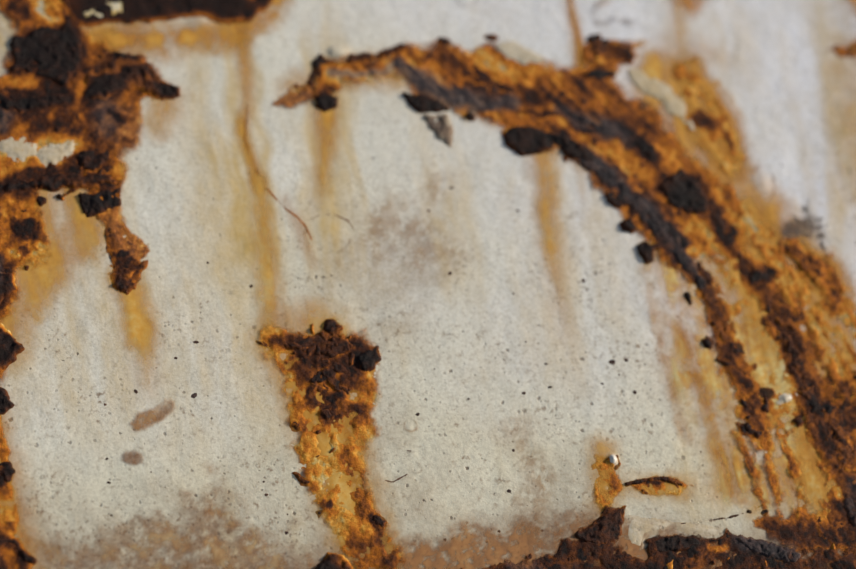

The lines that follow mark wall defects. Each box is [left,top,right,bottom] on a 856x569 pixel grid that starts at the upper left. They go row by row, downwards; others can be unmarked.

corrosion [0,0,284,569]
corrosion [237,0,856,569]